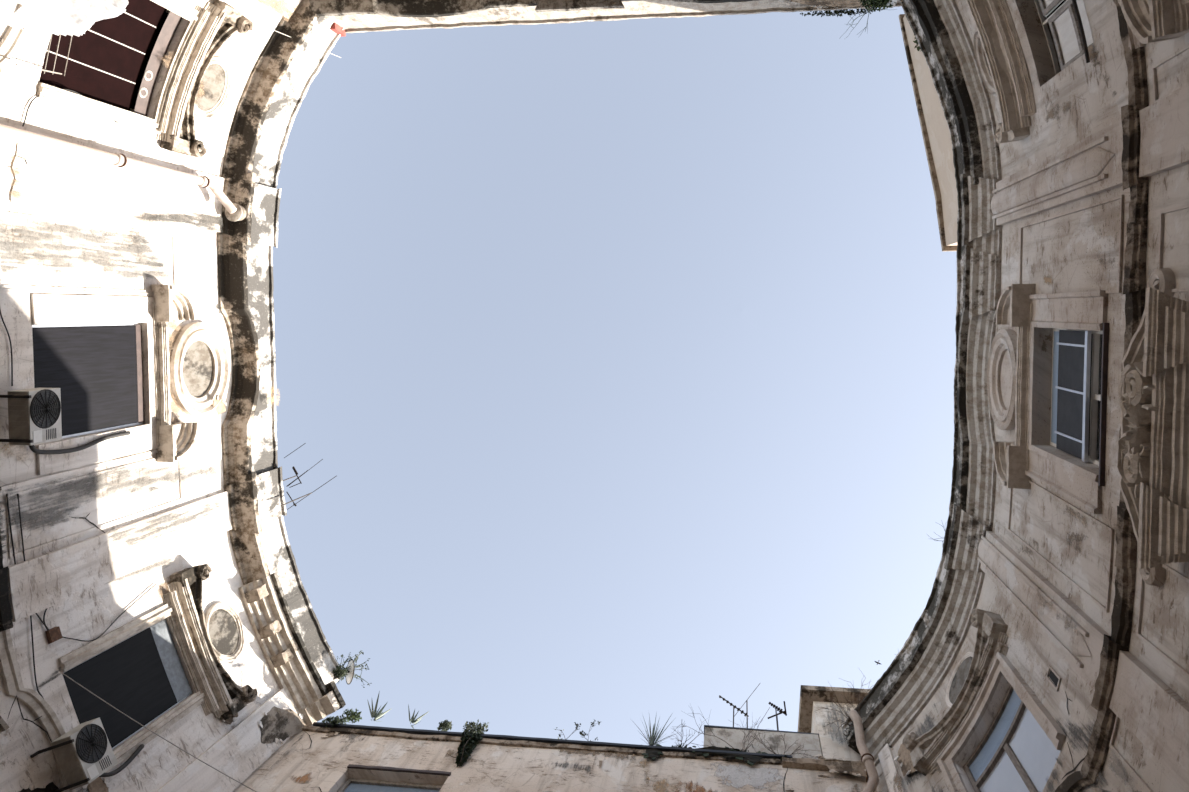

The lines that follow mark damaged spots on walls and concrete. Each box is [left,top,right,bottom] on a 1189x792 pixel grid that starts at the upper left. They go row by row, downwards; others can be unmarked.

leakage [0,213,223,279]
leakage [1,462,218,552]